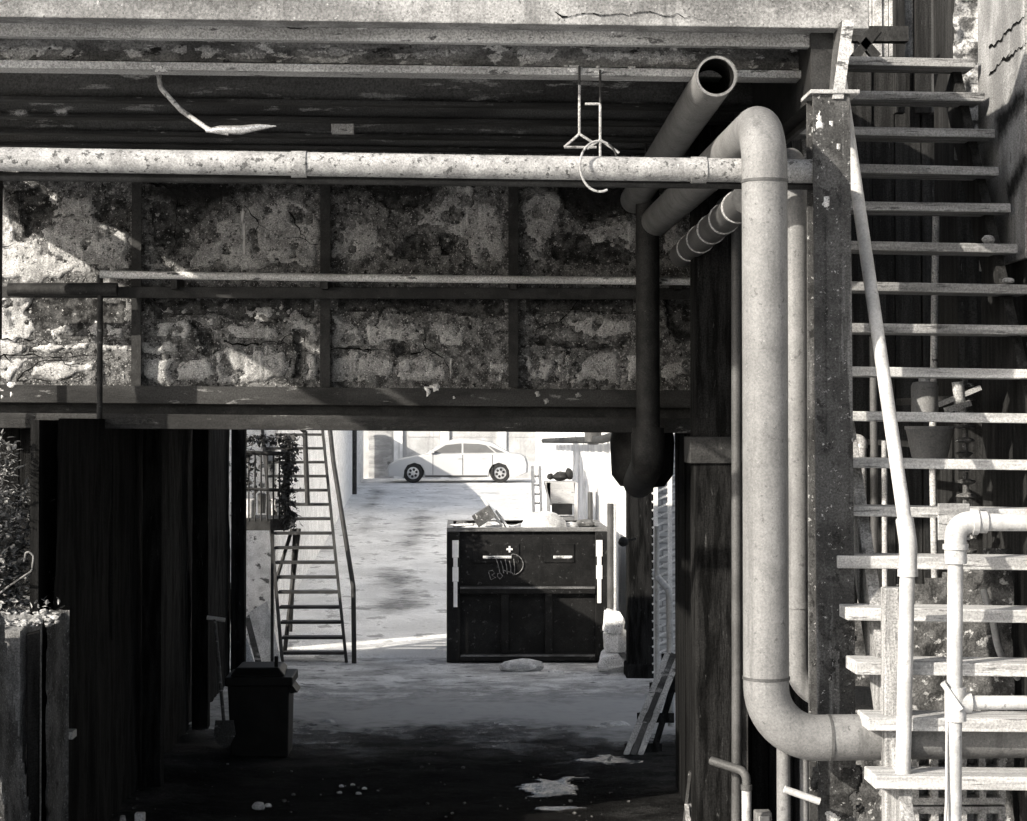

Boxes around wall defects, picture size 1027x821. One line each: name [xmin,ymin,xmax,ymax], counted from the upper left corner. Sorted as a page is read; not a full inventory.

crack [555,11,703,20]
spalling [3,44,83,61]
spalling [171,43,228,58]
crack [989,12,1027,75]
leakage [338,185,434,197]